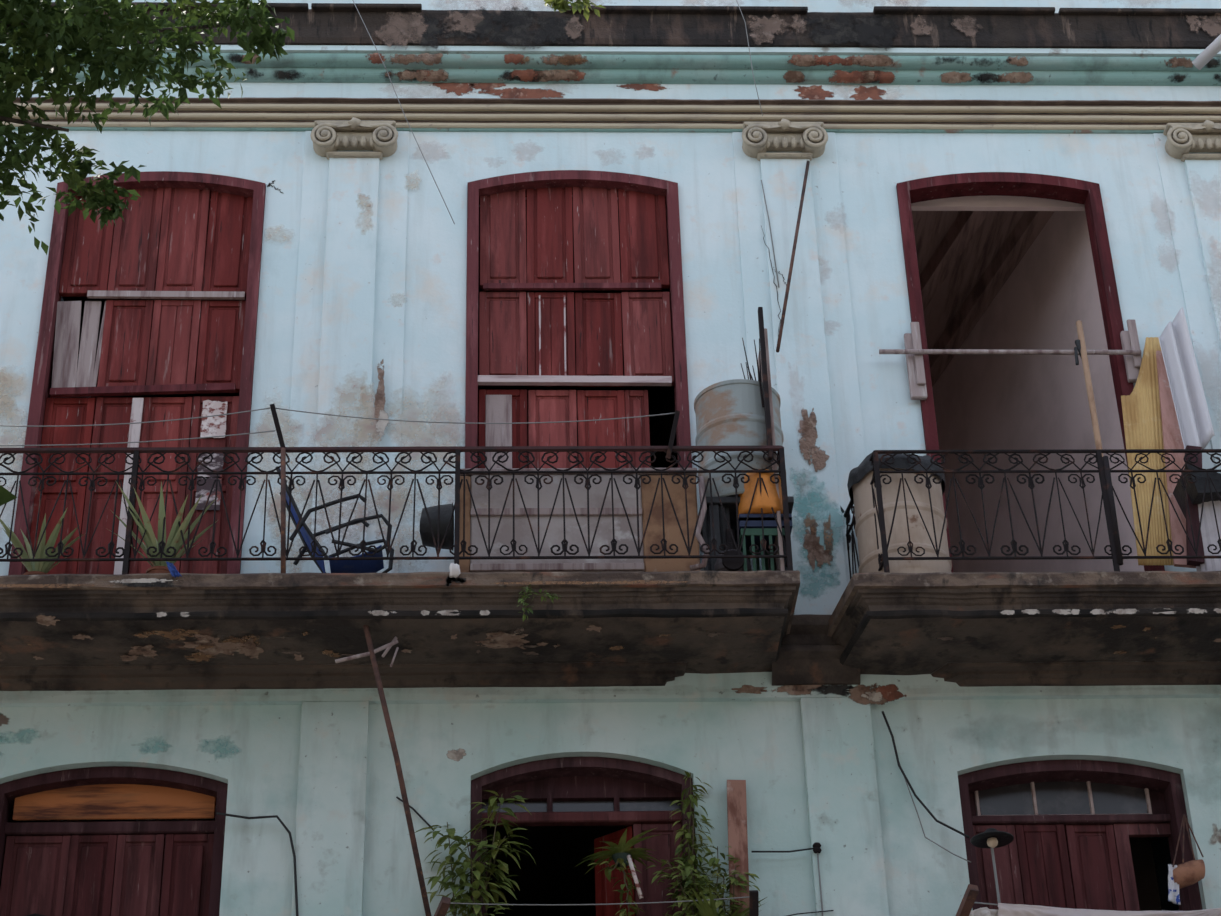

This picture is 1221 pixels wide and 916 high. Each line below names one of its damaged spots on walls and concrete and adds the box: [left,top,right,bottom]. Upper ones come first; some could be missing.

peeling [366,10,588,99]
peeling [783,54,895,100]
spalling [910,15,932,35]
spalling [953,15,981,37]
spalling [798,408,830,472]
spalling [803,513,834,570]